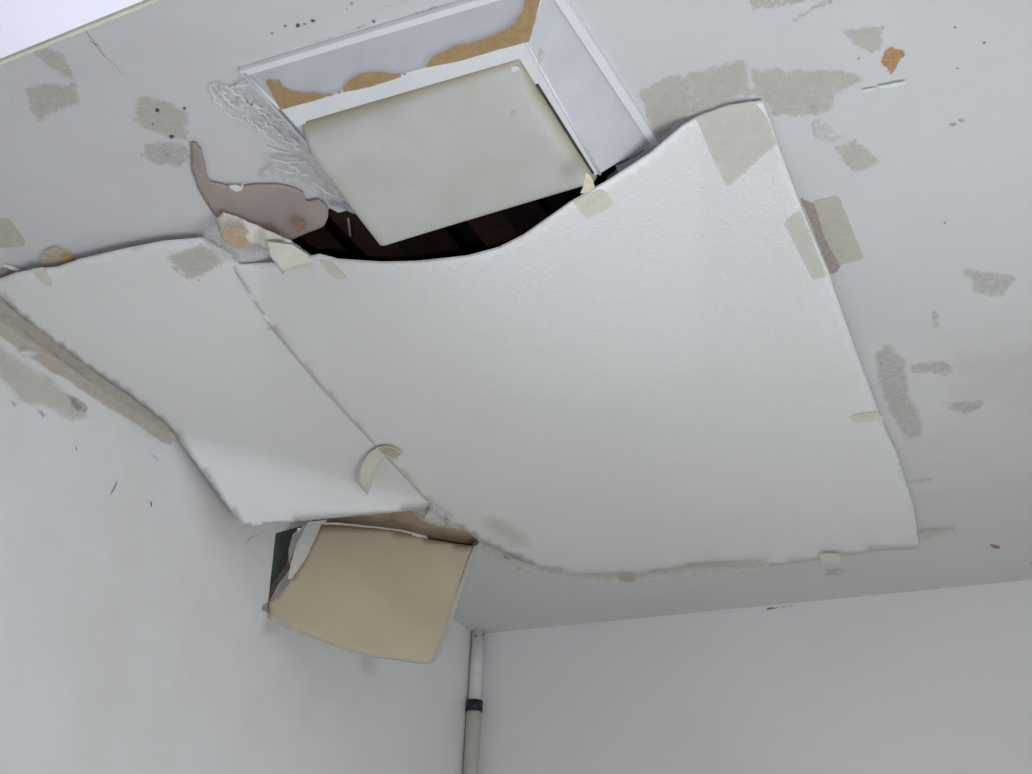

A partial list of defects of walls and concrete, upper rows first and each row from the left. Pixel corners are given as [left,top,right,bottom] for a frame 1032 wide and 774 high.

peeling [191,141,328,273]